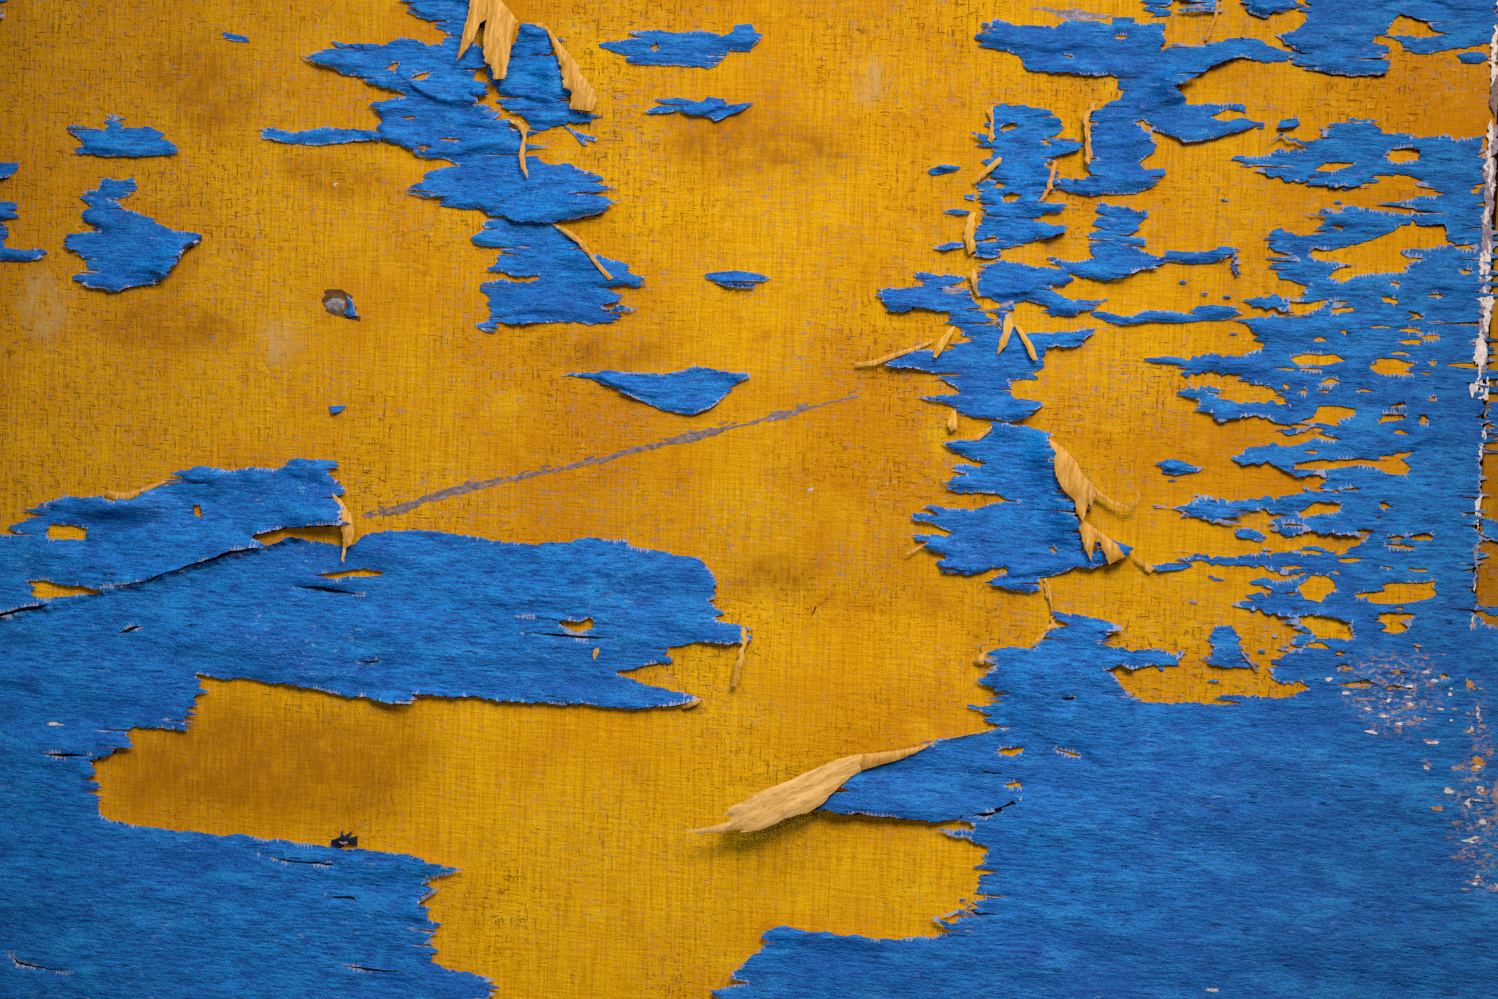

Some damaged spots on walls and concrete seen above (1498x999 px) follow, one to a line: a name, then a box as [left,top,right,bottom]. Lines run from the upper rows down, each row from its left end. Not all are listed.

peeling [599,24,763,69]
peeling [643,97,754,121]
peeling [67,114,180,157]
peeling [259,0,645,332]
peeling [0,178,203,292]
peeling [855,0,1498,604]
peeling [561,366,751,414]
crack [114,548,259,586]
peeling [1202,220,1498,892]
crack [0,604,47,619]
crack [122,625,141,633]
peeling [95,598,997,999]